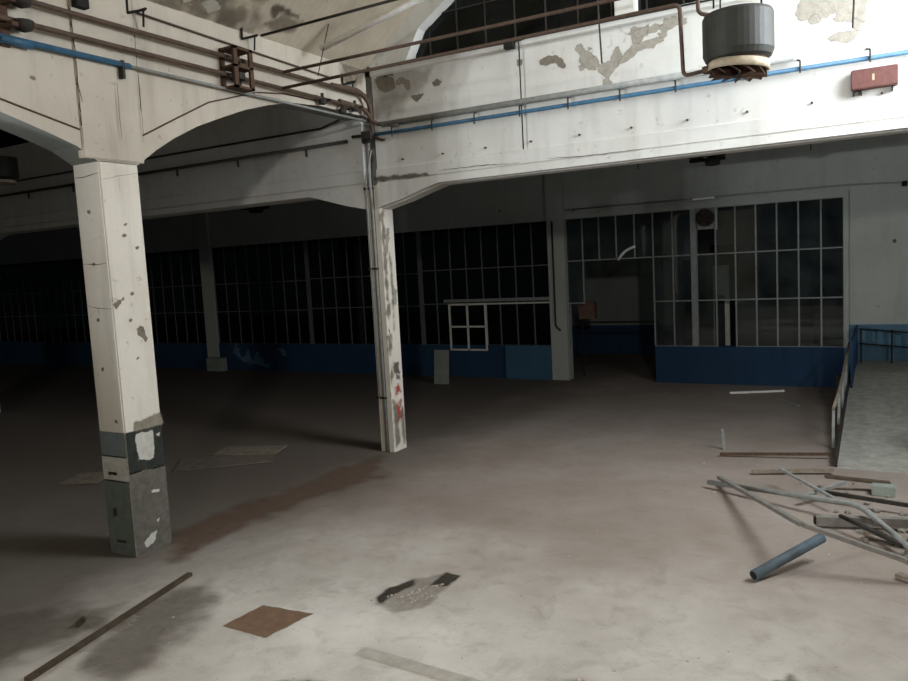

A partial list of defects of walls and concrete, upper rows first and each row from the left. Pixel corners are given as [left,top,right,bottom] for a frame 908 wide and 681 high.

damp [154,0,246,27]
damp [266,5,298,31]
peeling [795,0,870,43]
crack [67,4,83,126]
spalling [540,55,566,68]
peeling [575,15,687,85]
spalling [375,74,423,102]
peeling [135,430,160,460]